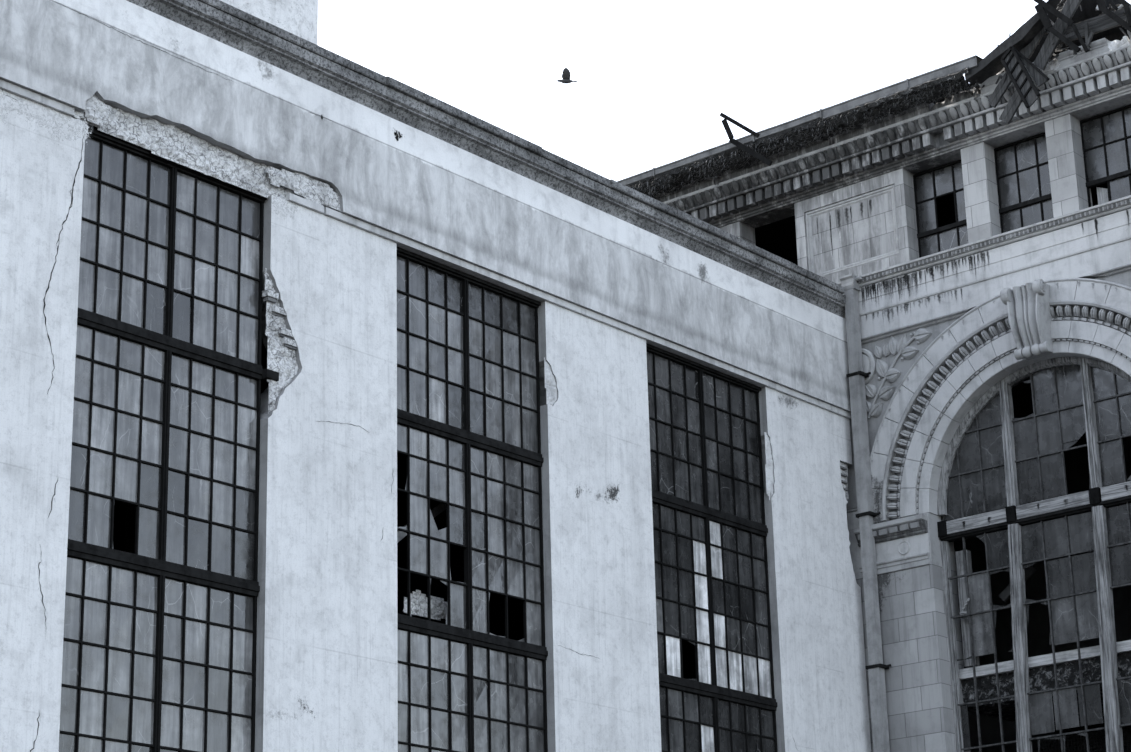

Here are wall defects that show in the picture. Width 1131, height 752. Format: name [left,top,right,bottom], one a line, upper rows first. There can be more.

spalling [0,89,340,218]
crack [43,116,85,394]
spalling [262,268,299,414]
spalling [544,358,557,405]
leakage [861,251,989,319]
spalling [764,432,774,500]